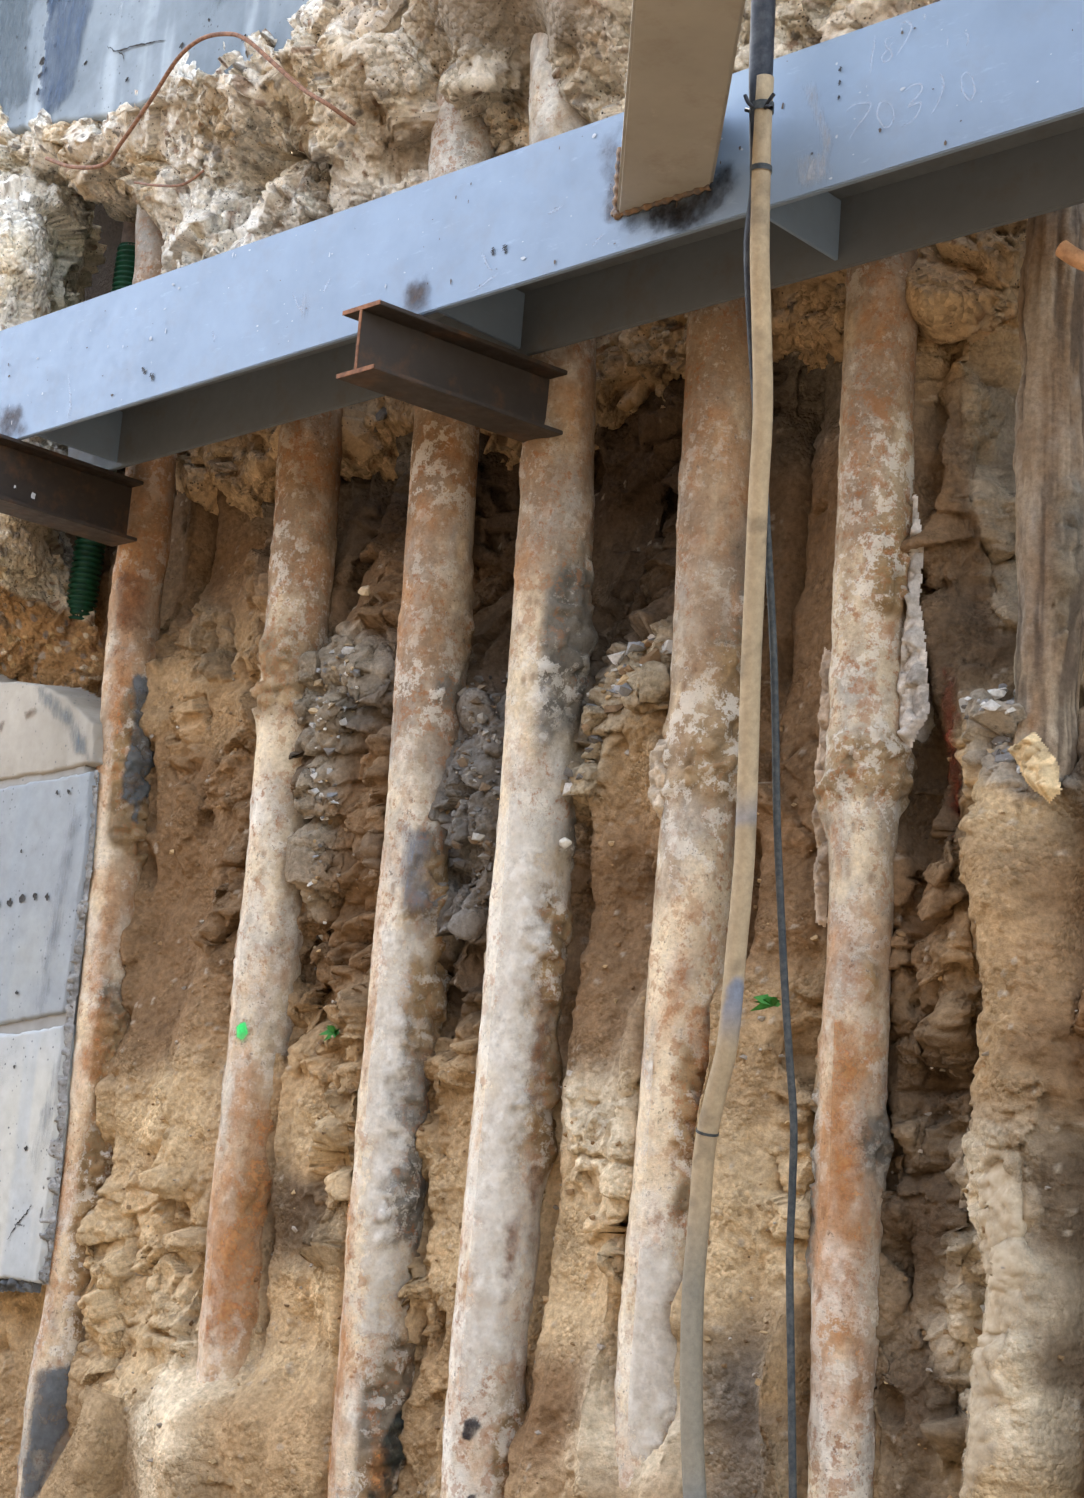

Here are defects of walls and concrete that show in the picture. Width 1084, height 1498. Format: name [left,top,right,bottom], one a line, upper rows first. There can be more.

damp [0,0,89,111]
spalling [774,0,941,59]
spalling [0,0,633,331]
spalling [771,269,847,374]
spalling [906,219,1028,346]
spalling [595,312,688,450]
spalling [175,425,281,520]
spalling [340,396,414,483]
spalling [0,513,105,696]
rust [116,573,144,626]
rust [832,1021,858,1093]
rust [206,1118,274,1340]